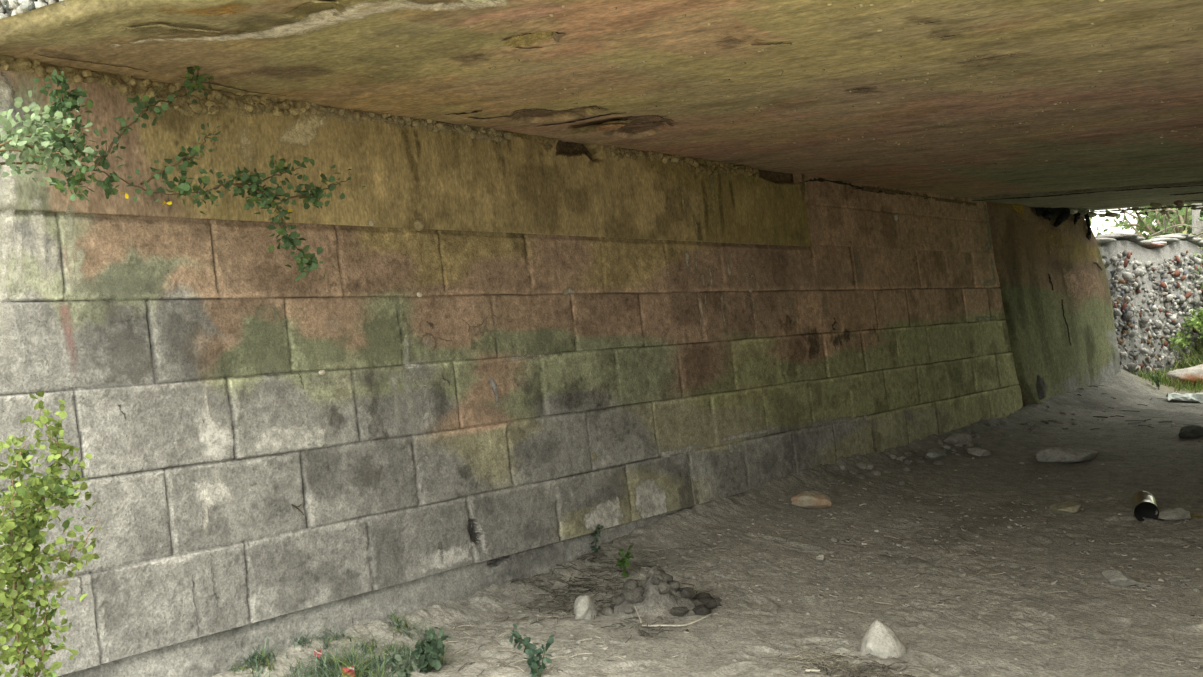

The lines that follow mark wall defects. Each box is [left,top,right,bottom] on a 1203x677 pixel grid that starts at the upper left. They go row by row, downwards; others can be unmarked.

water stain [114,0,506,46]
spalling [0,55,687,165]
water stain [780,300,850,358]